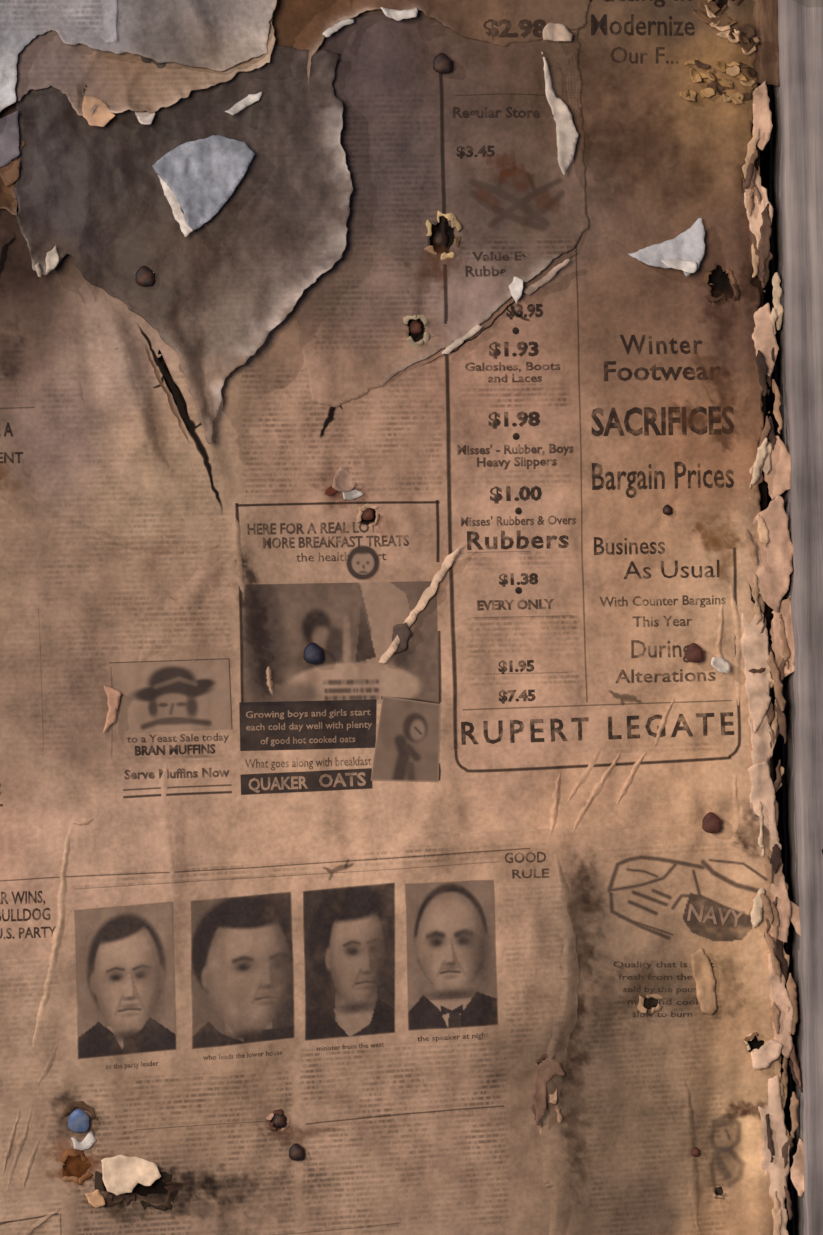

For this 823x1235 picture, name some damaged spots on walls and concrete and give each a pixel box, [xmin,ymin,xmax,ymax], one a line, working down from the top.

peeling [403,315,430,347]
crack [428,293,528,363]
crack [140,328,221,505]
leakage [112,1169,221,1212]